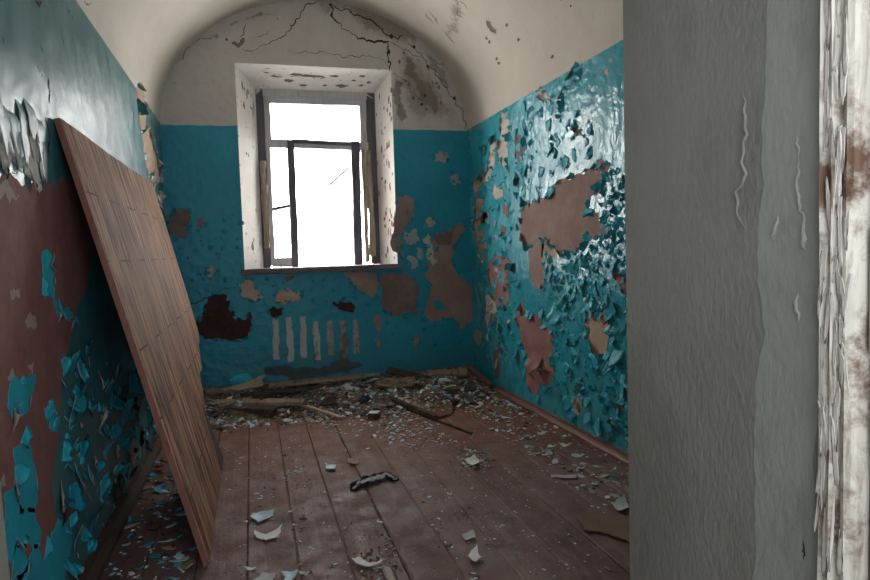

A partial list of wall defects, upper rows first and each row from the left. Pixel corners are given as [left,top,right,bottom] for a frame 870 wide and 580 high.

peeling [261,69,371,91]
crack [240,1,467,129]
spalling [485,18,508,43]
peeling [0,92,158,580]
peeling [137,82,305,342]
peeling [332,300,357,314]
peeling [344,62,628,448]